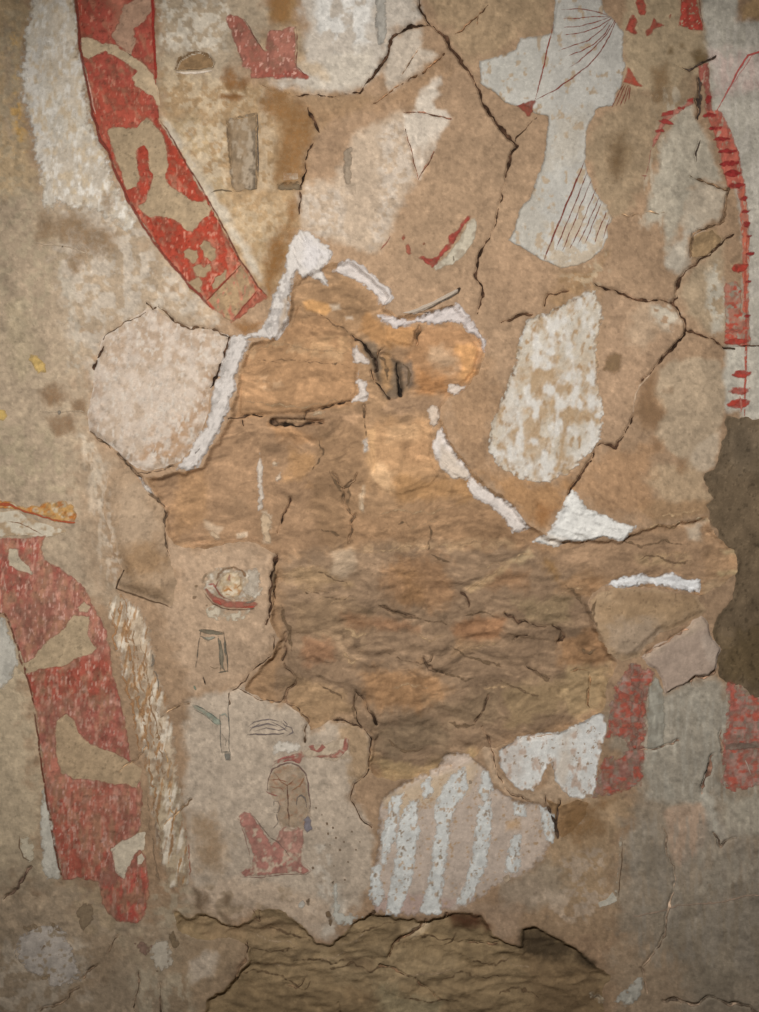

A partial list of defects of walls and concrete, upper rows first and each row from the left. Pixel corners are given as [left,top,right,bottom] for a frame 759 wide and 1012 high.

crack [296,0,537,314]
crack [92,302,230,388]
crack [228,335,402,427]
crack [501,290,569,323]
crack [567,55,759,495]
crack [40,410,174,553]
crack [332,473,357,538]
spalling [139,230,738,781]
spalling [174,909,611,1012]